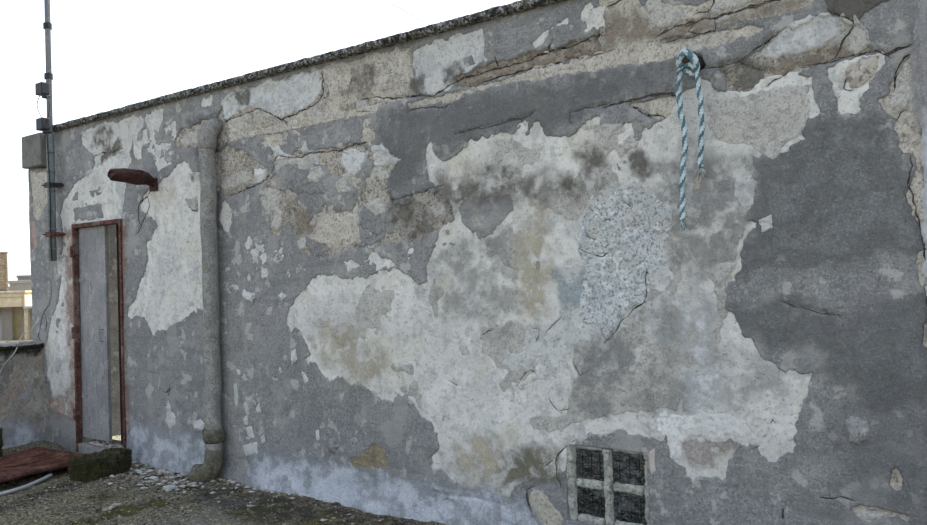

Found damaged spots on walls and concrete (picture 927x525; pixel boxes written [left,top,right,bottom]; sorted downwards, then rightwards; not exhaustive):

crack [656,0,780,43]
crack [709,11,913,91]
flaking render [878,59,926,226]
flaking render [30,171,48,251]
crack [907,156,926,260]
flaking render [45,108,208,419]
flaking render [201,0,886,525]
flaking render [166,401,176,429]
flaking render [193,419,205,431]
leakage [180,369,541,525]
spalling [890,468,903,491]